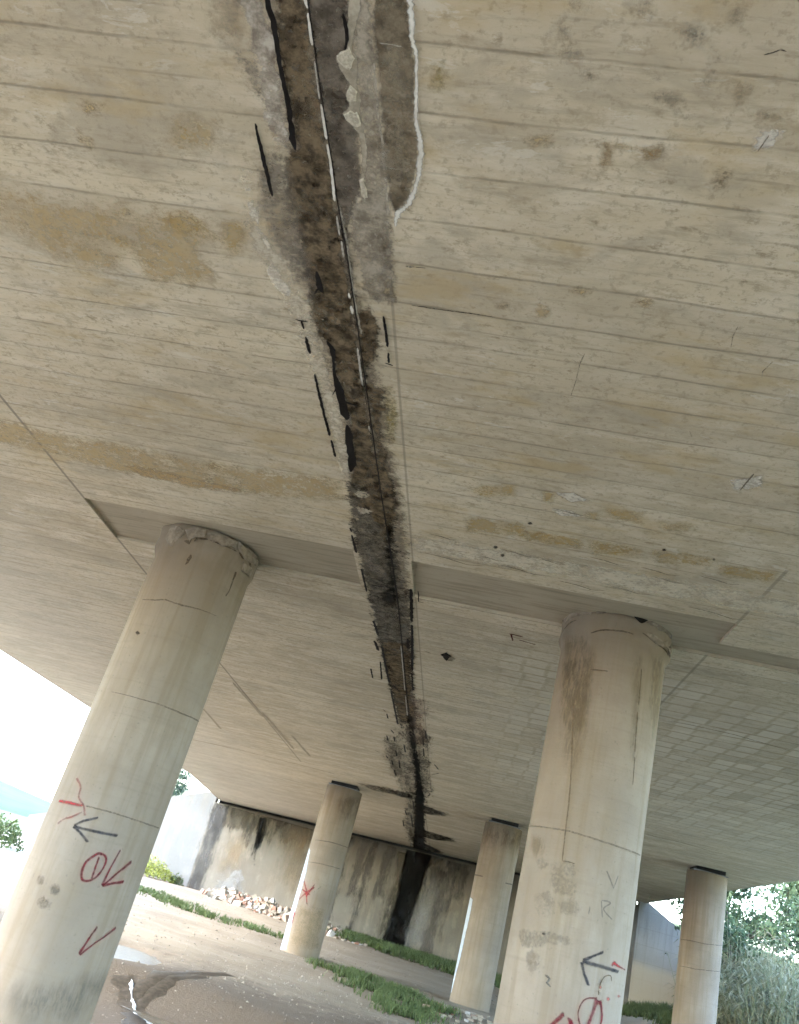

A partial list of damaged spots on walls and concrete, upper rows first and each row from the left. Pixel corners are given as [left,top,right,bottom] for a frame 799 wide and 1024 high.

crack [295,319,336,457]
peeling [336,0,402,333]
water stain [276,0,469,954]
crack [307,0,439,827]
crack [412,305,491,317]
water stain [189,804,313,890]